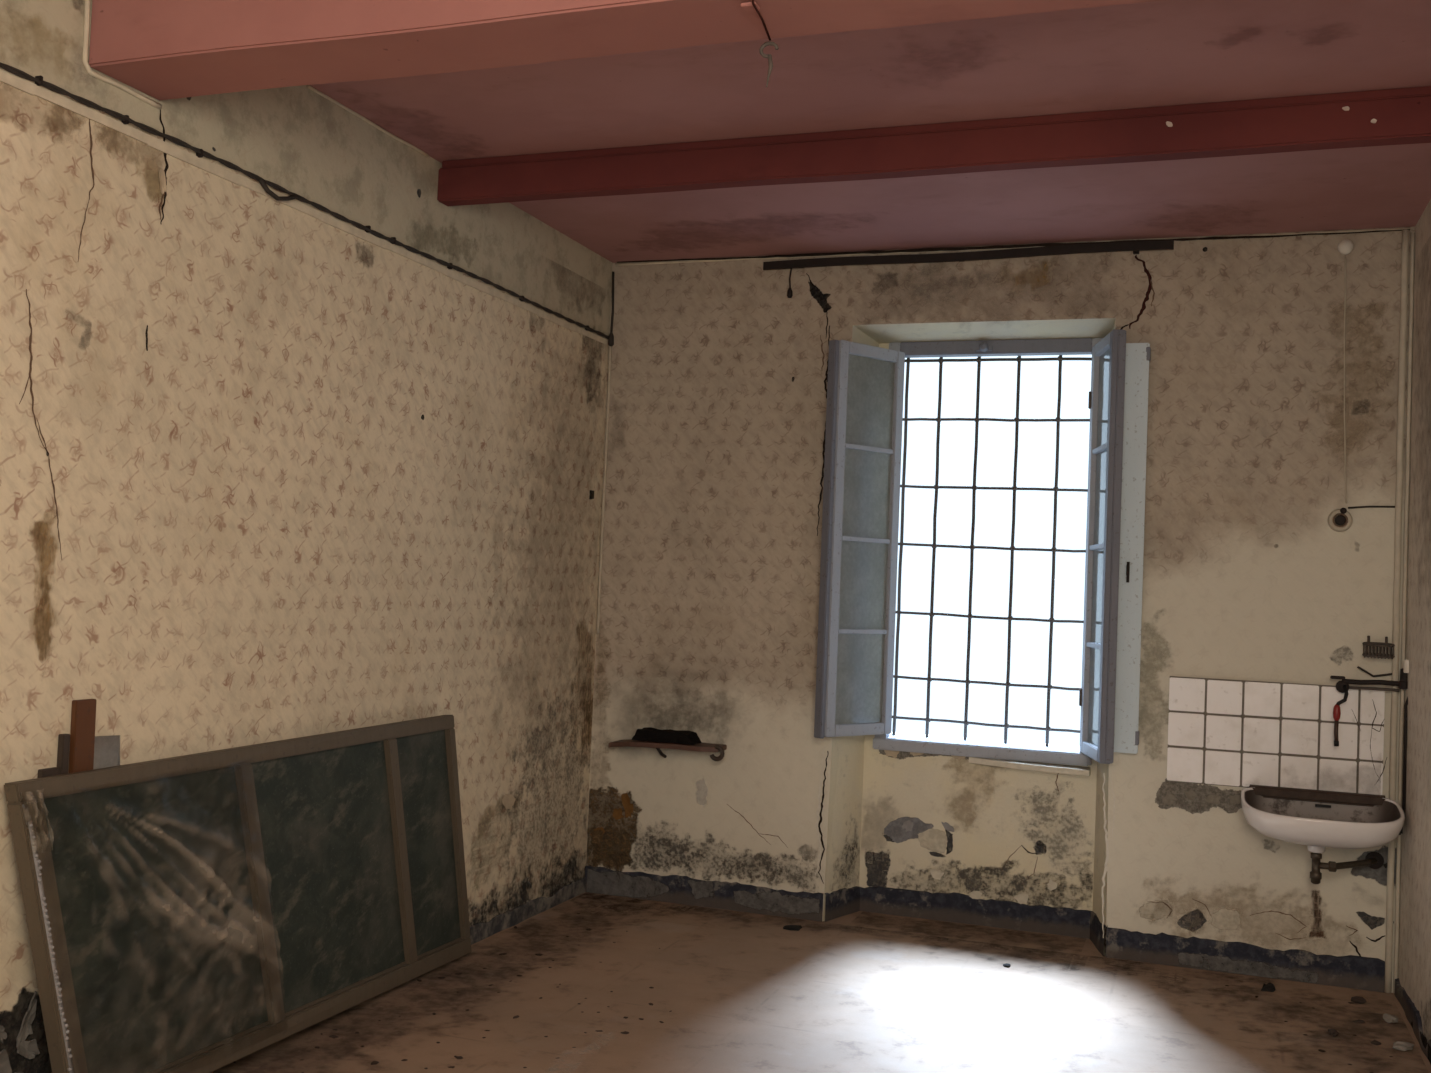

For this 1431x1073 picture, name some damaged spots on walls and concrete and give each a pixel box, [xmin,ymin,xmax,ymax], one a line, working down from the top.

crack [78,119,95,261]
crack [617,229,1410,330]
crack [19,289,62,559]
water stain [468,849,586,925]
water stain [632,822,817,889]
crack [727,746,829,884]
flaking render [884,817,954,857]
water stain [865,852,1093,910]
flaking render [1155,778,1242,814]